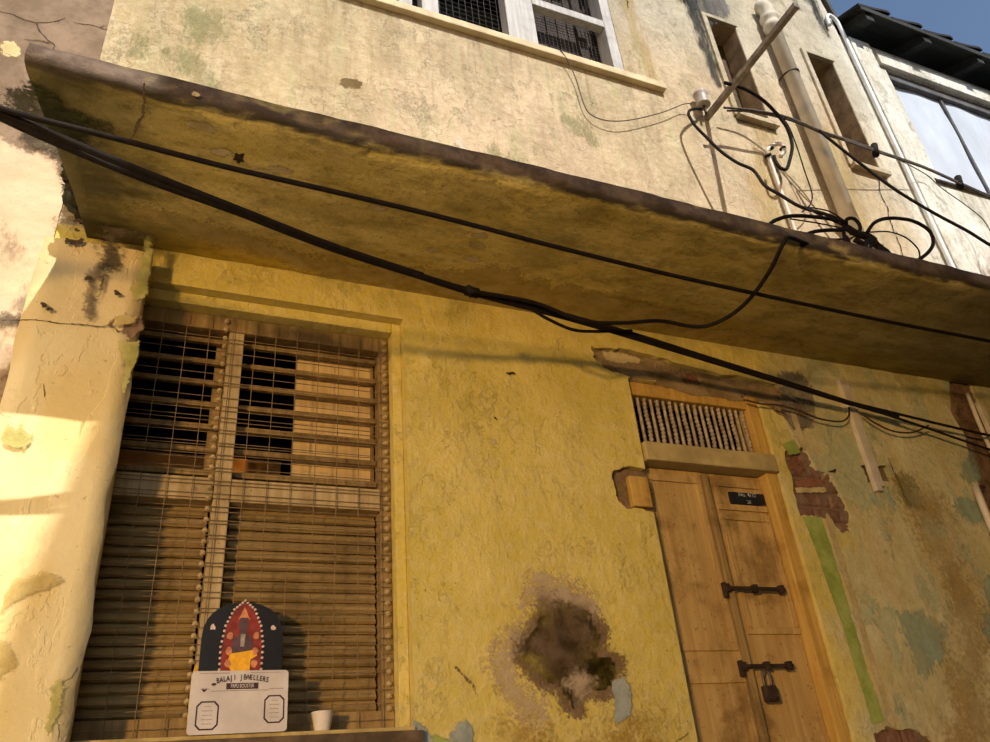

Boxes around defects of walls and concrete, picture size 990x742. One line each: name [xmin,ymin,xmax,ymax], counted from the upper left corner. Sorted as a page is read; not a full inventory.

crack [0,11,107,49]
damp [0,0,114,146]
damp [683,0,730,87]
damp [0,122,63,173]
crack [1,319,136,327]
spalling [108,315,144,393]
peeling [125,202,817,360]
spalling [592,350,815,430]
spalling [785,448,849,533]
spalling [949,382,990,525]
spalling [489,570,632,729]
spalling [874,728,930,742]